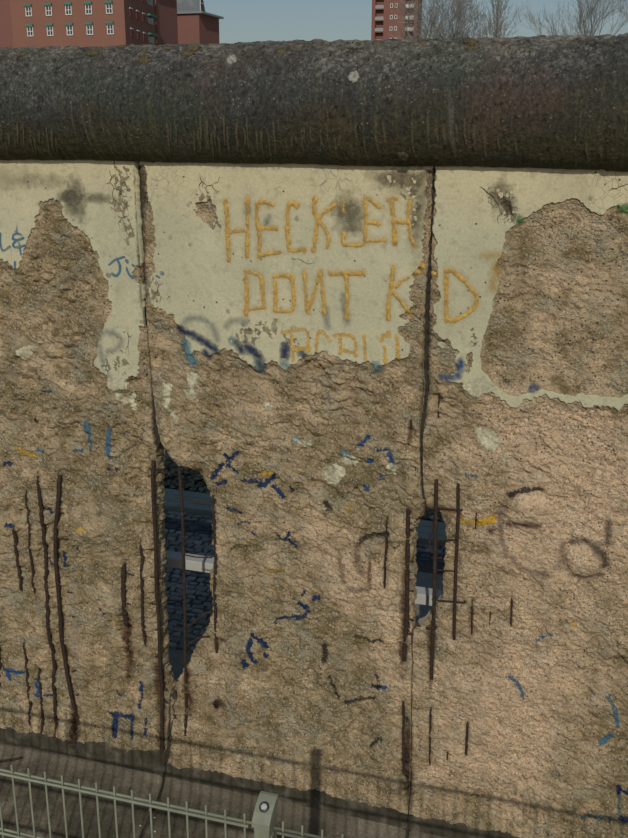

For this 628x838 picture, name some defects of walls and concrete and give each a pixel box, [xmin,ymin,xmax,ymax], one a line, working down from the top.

damp [62,188,102,213]
peeling [110,161,135,256]
crack [427,171,435,257]
spalling [0,198,166,752]
spalling [133,165,628,838]
corrosion [68,712,79,744]
crack [156,690,177,752]